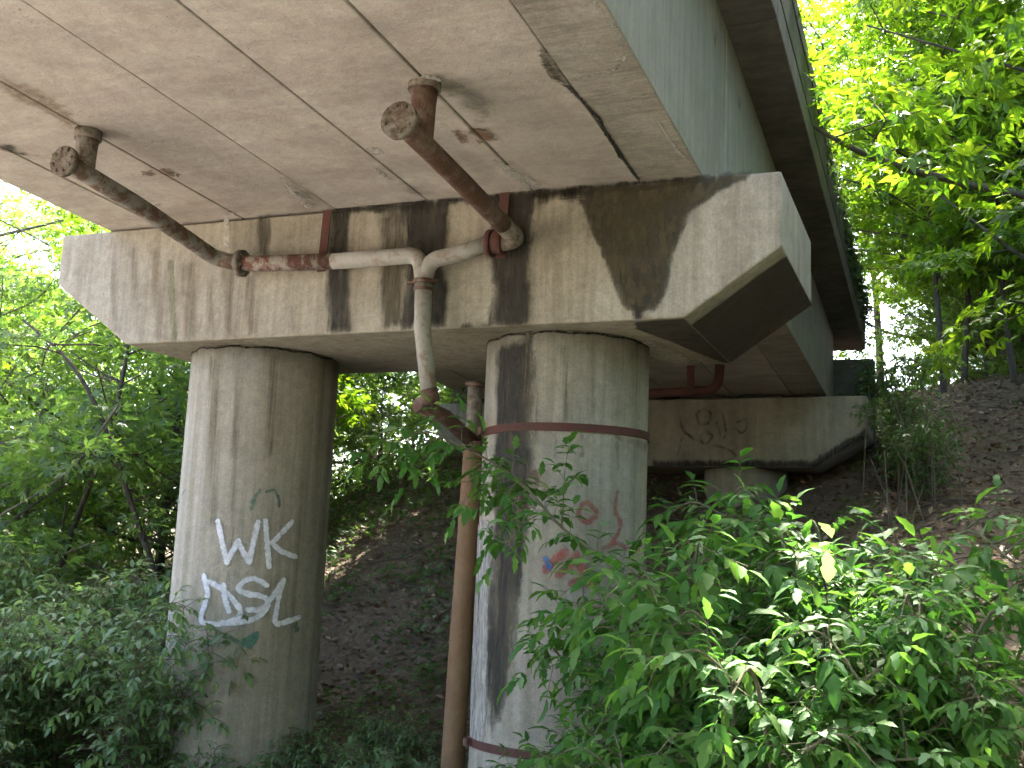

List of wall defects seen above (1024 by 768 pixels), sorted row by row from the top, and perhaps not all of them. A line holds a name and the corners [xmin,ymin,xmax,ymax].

corrosion [455,128,497,143]
crack [564,85,640,180]
water stain [331,198,468,256]
water stain [326,269,351,332]
water stain [381,264,415,328]
water stain [431,267,447,325]
water stain [470,159,812,742]